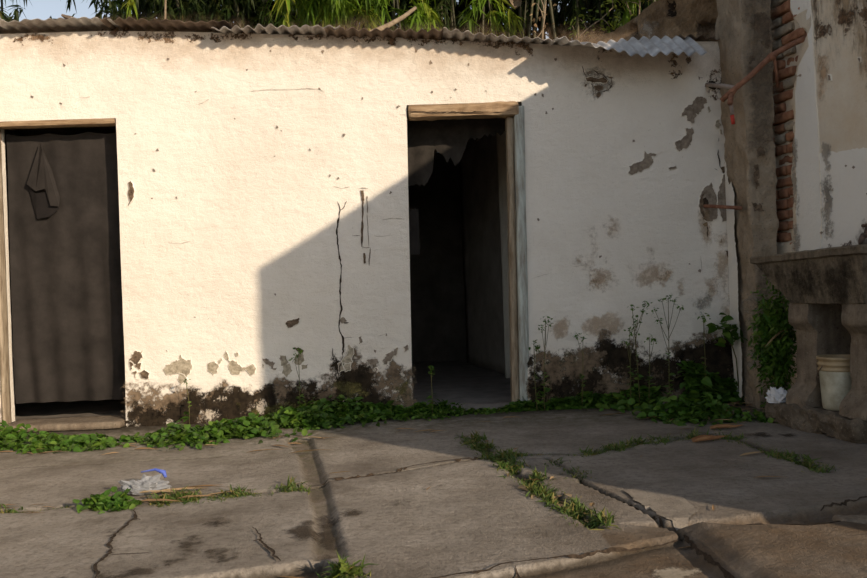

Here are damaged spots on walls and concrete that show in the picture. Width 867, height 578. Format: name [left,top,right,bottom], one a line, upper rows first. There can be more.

leakage [813,0,867,67]
spalling [582,66,613,98]
peeling [674,76,723,152]
peeling [627,151,657,176]
leakage [822,143,830,170]
leakage [821,182,833,247]
crack [332,201,352,376]
peeling [129,350,151,380]
peeling [163,354,193,385]
peeling [207,347,308,377]
leakage [124,347,417,427]
leakage [526,329,734,404]